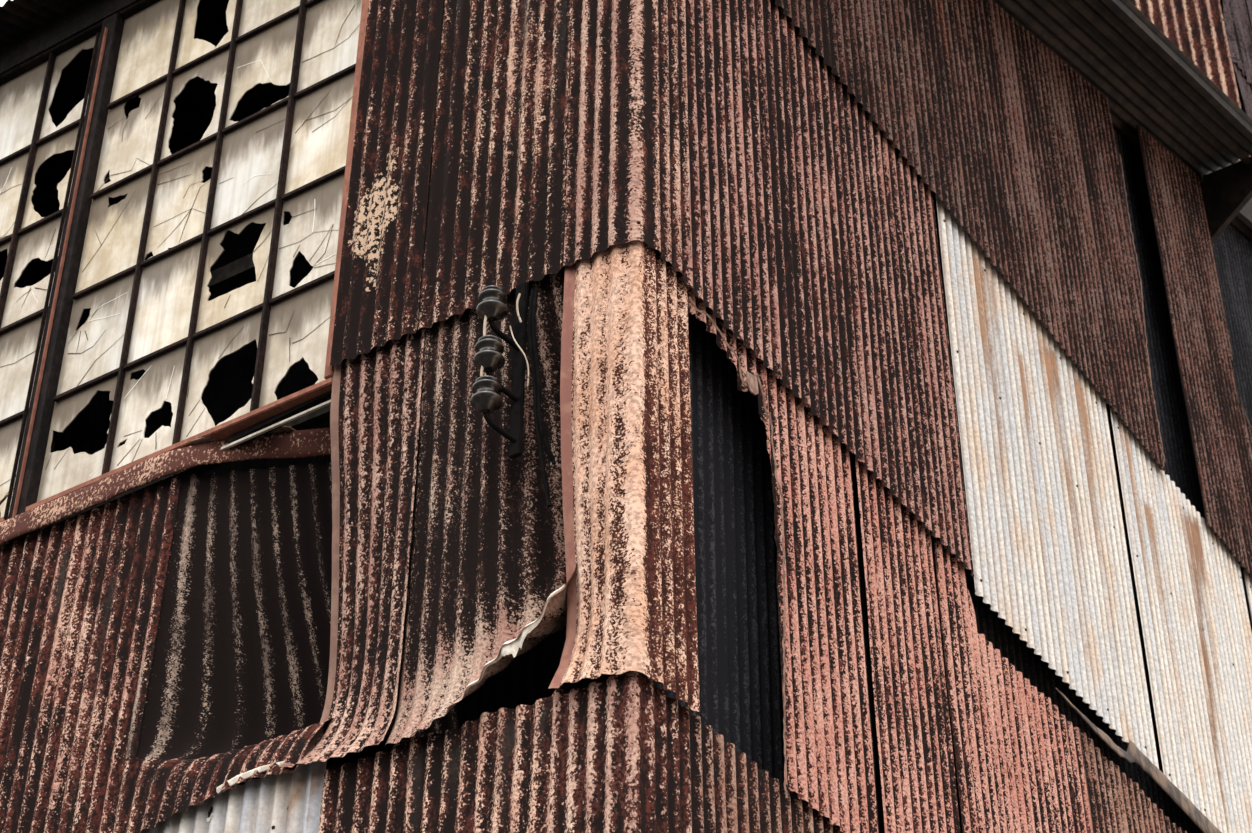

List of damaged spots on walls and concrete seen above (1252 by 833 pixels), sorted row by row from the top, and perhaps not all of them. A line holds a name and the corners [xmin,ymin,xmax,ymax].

peeling [348,144,401,291]
corrosion [972,258,998,364]
corrosion [1018,355,1028,427]
corrosion [1040,346,1060,403]
corrosion [1073,378,1095,524]
corrosion [1123,431,1155,548]
corrosion [1185,518,1204,627]
corrosion [1202,646,1212,703]